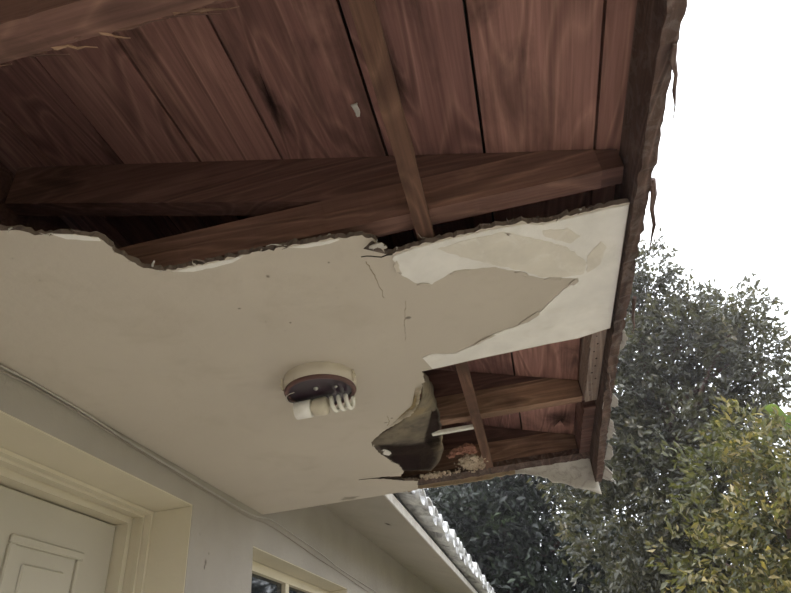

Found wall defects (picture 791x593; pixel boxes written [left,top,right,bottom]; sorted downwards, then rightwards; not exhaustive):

spalling [172,256,242,272]
spalling [289,239,339,248]
crack [361,241,393,298]
peeling [392,204,629,369]
spalling [403,419,616,494]